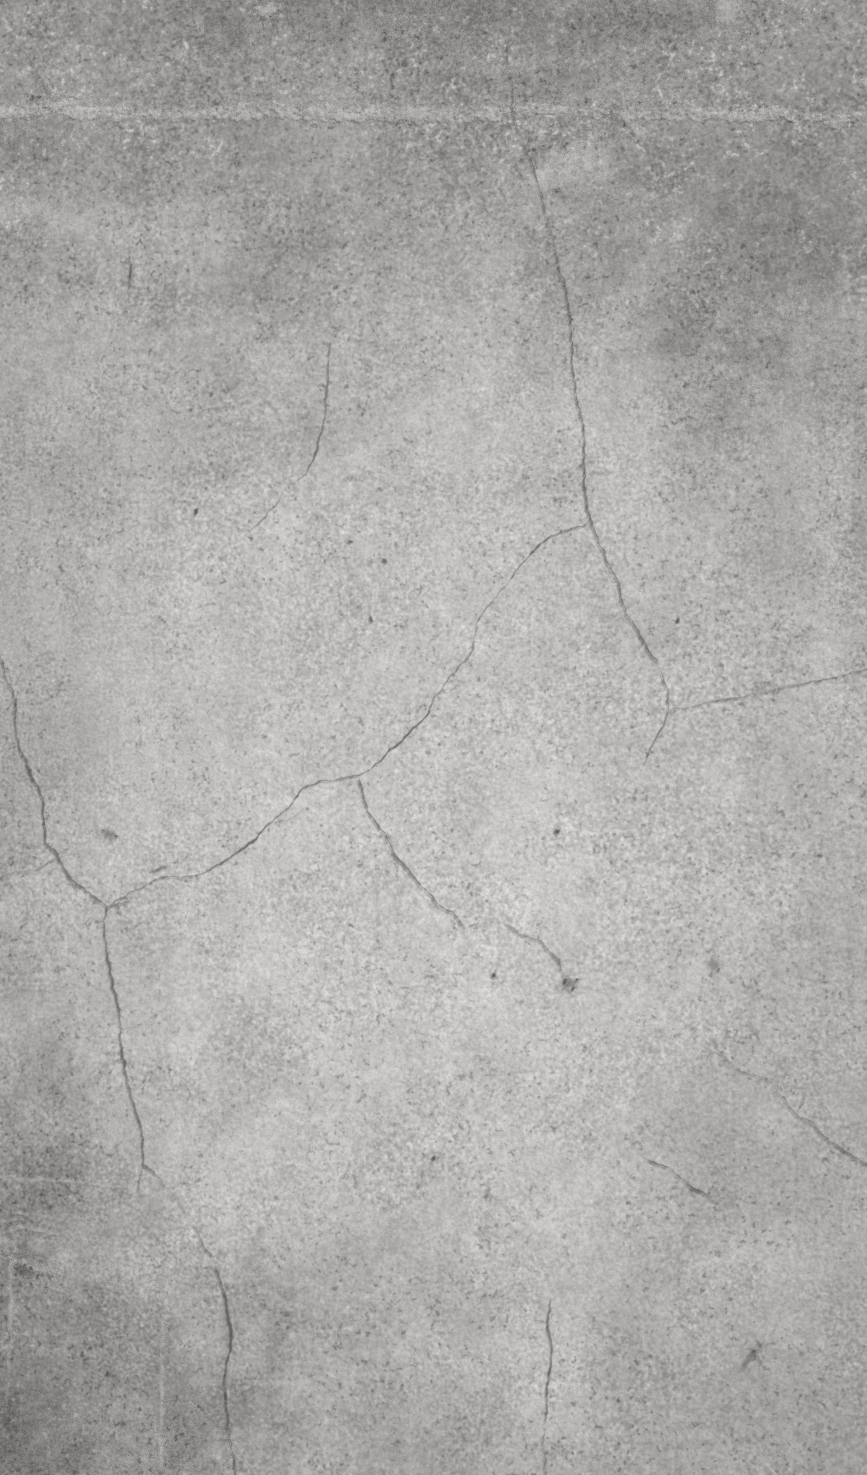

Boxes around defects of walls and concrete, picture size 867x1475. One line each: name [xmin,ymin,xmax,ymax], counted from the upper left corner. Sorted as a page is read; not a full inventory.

crack [308,370,329,468]
crack [468,255,669,756]
crack [1,659,462,1174]
crack [651,1161,705,1194]
crack [202,1242,236,1475]
crack [543,1302,553,1463]